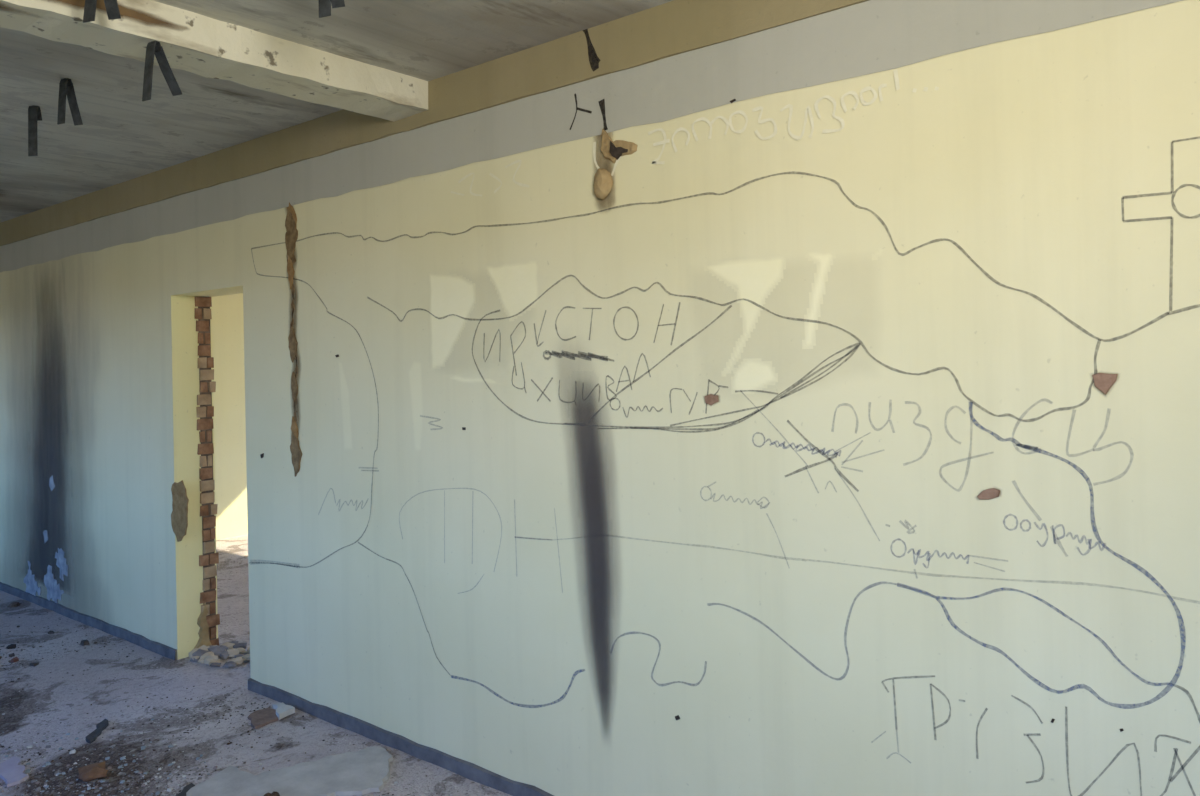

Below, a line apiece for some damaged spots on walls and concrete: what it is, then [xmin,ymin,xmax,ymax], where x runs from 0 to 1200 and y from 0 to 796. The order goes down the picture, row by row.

water stain [30,358,61,585]
flaking render [171,296,220,649]
water stain [578,406,607,694]